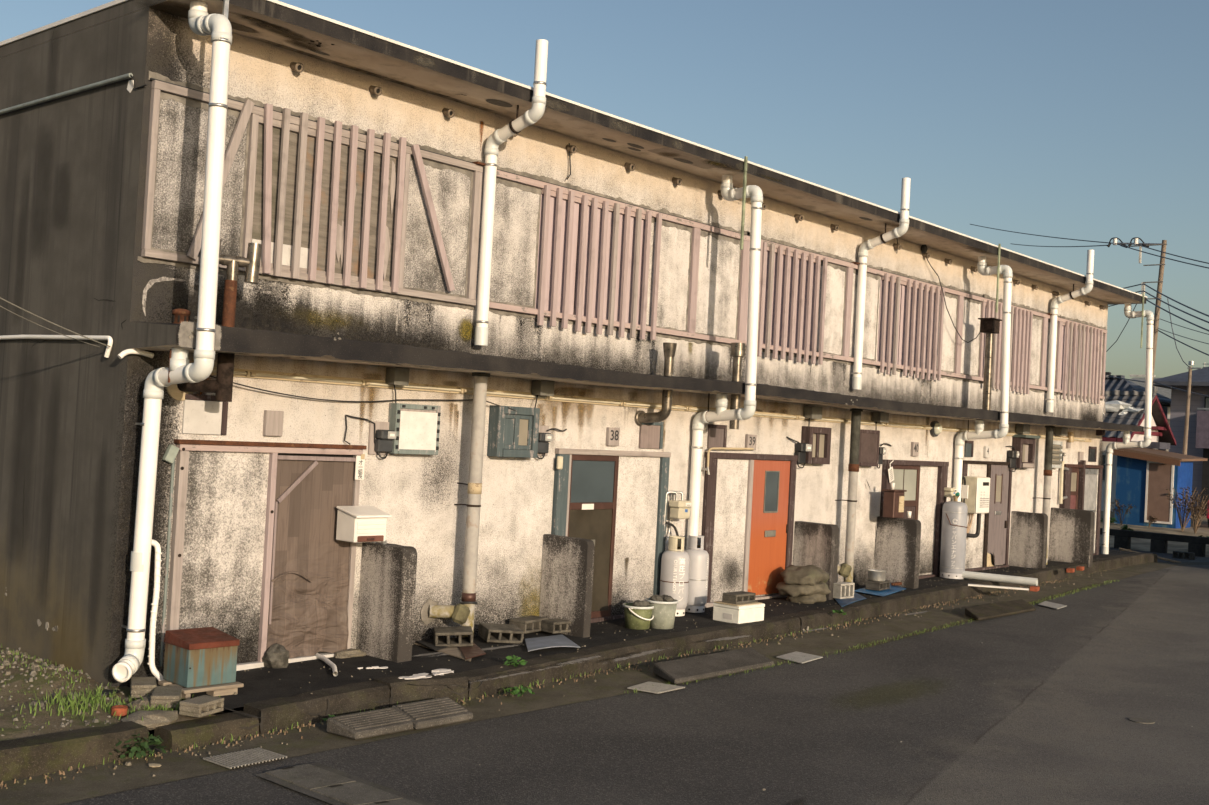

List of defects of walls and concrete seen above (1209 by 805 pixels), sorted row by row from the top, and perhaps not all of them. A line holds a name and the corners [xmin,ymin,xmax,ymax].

damp [143,2,190,19]
damp [230,16,488,110]
damp [145,277,199,323]
damp [215,279,470,353]
damp [499,316,657,374]
damp [418,436,461,509]
damp [413,593,455,645]
damp [473,587,526,637]